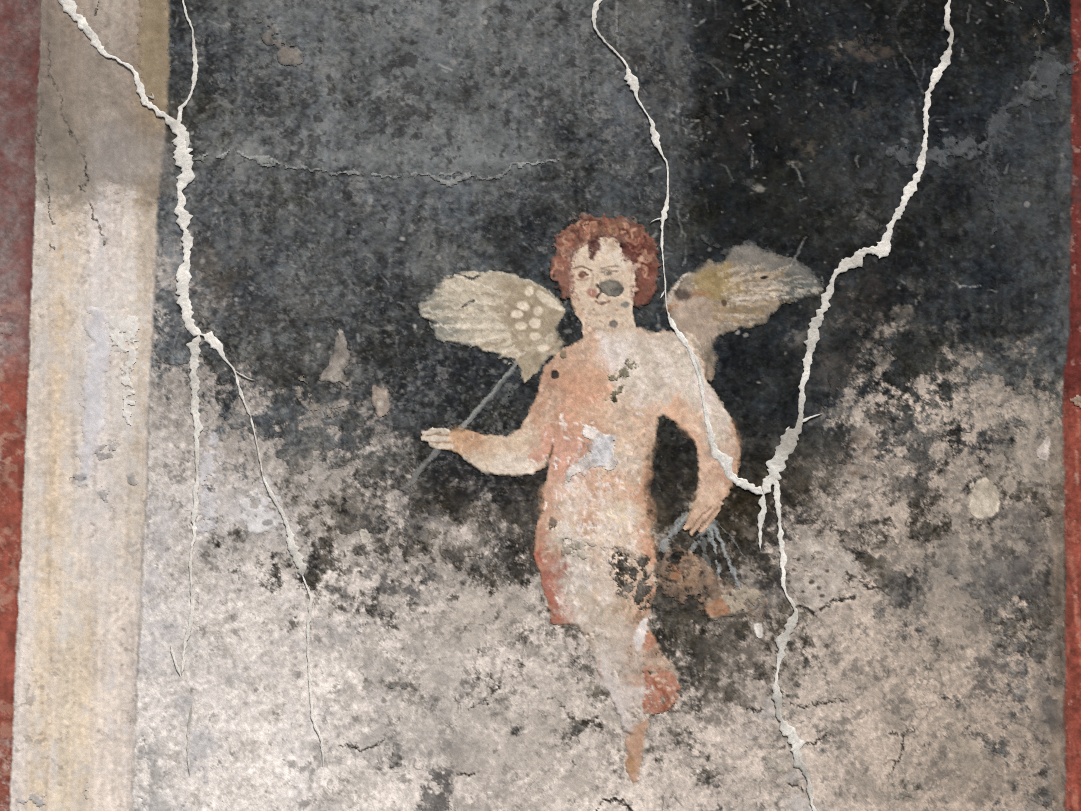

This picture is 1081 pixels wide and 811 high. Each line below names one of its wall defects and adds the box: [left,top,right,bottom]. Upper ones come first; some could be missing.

crack [36,134,56,251]
crack [58,0,385,763]
crack [592,0,954,811]
water stain [192,430,223,534]
water stain [239,471,290,536]
peeling [126,309,1081,811]
water stain [133,730,171,811]
crack [185,704,193,775]